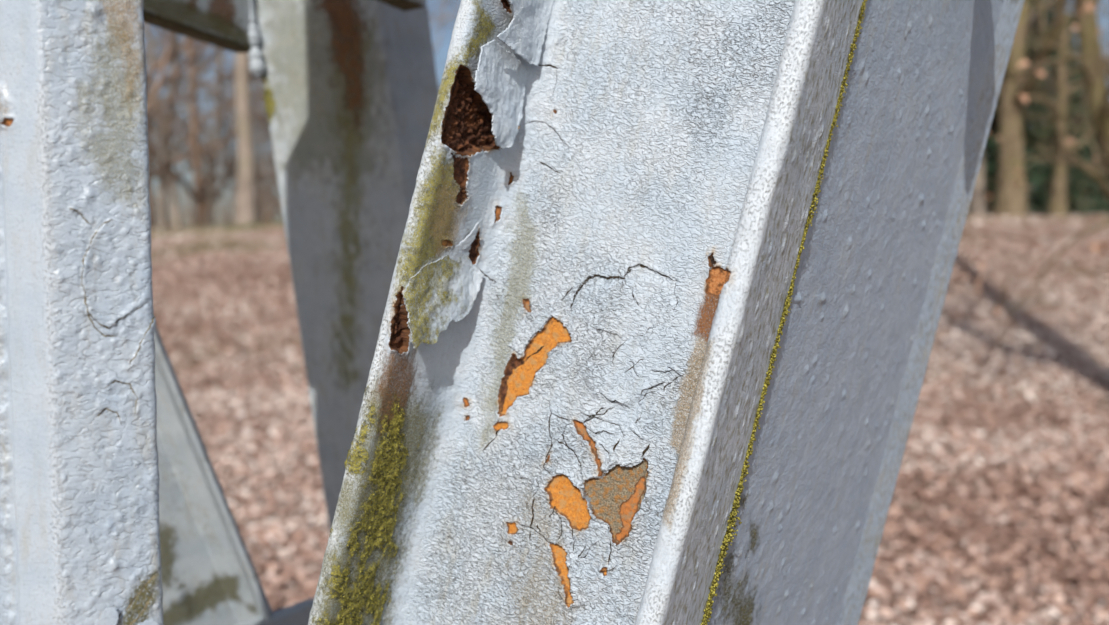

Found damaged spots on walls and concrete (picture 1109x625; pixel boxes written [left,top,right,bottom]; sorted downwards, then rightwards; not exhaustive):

rust [143,0,251,49]
peeling [425,0,559,205]
crack [69,208,155,425]
peeling [94,572,160,625]
peeling [389,222,496,354]
peeling [483,299,580,451]
peeling [507,417,650,625]
crack [520,263,680,608]